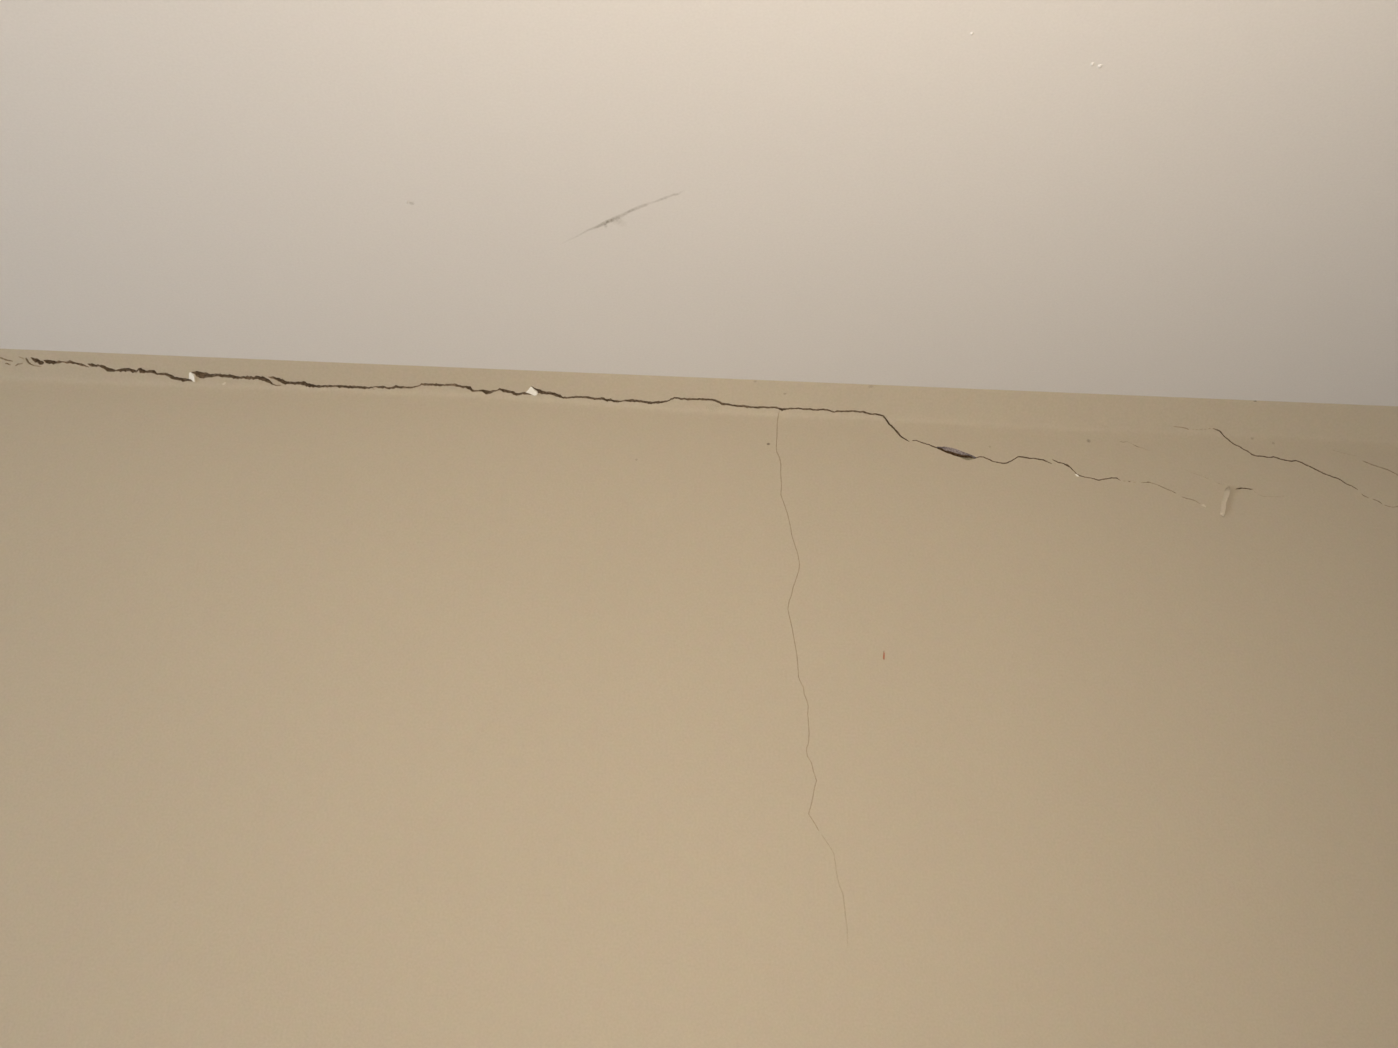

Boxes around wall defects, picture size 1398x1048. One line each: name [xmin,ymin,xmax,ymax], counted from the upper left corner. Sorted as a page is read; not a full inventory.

crack [0,357,937,946]
crack [977,425,1398,507]